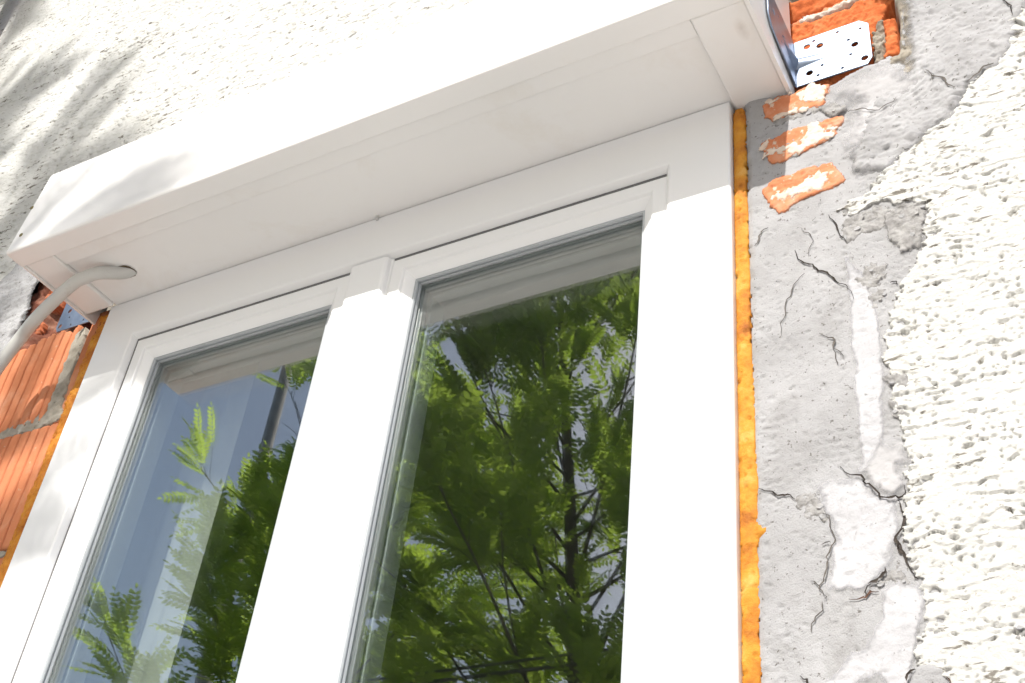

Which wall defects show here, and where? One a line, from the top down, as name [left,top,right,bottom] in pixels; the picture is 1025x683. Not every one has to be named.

spalling [759,0,915,214]
spalling [842,206,893,244]
spalling [14,282,53,335]
crack [780,216,854,336]
spalling [854,262,891,308]
crack [820,333,843,364]
spalling [882,372,909,387]
flaking render [0,301,117,565]
peeling [866,444,906,492]
crack [759,488,794,499]
spalling [795,492,829,523]
crack [811,467,918,632]